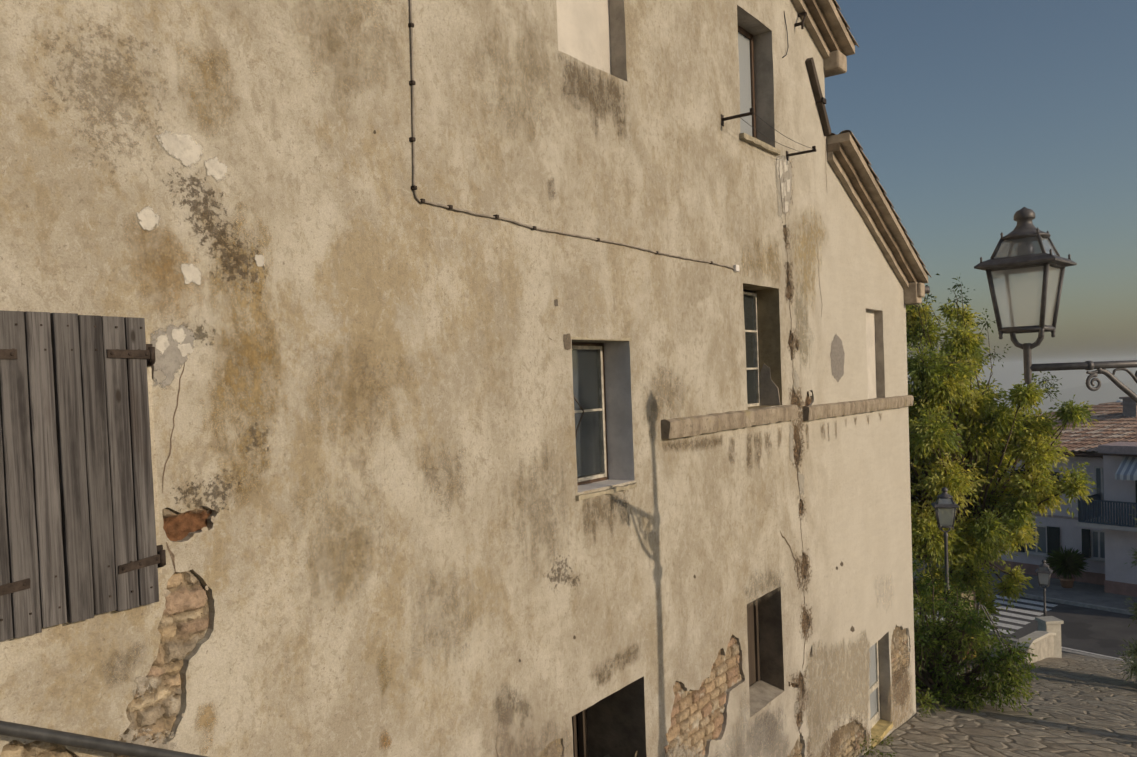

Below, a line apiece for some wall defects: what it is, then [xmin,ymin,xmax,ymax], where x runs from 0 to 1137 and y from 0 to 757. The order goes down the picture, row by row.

water stain [563,62,625,134]
flaking render [137,205,161,231]
flaking render [181,263,201,285]
flaking render [155,327,194,358]
water stain [148,167,277,514]
crack [162,362,185,493]
crack [775,162,871,757]
flaking render [162,506,216,541]
crack [166,542,176,572]
flaking render [659,636,741,757]
crack [893,664,910,708]
flaking render [119,727,178,757]